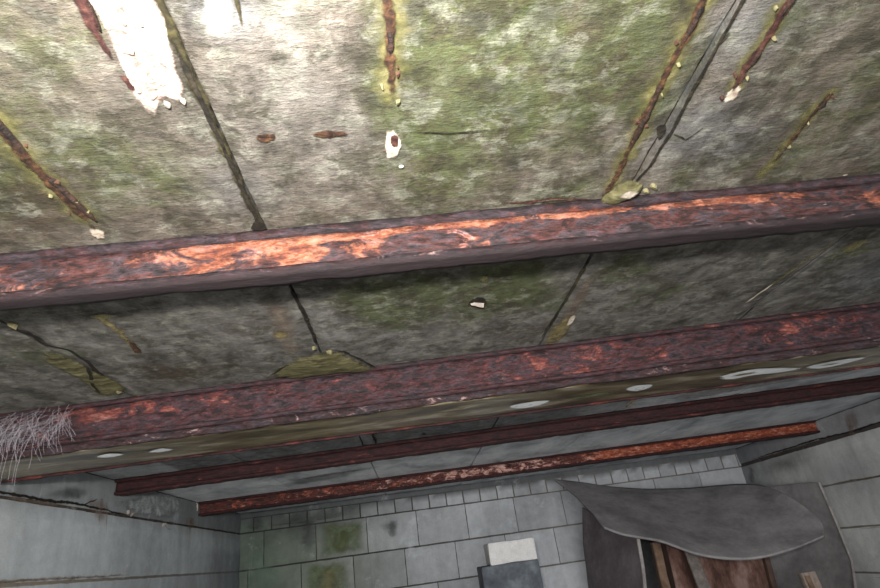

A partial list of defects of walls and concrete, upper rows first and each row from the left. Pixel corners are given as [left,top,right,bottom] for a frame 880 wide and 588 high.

spalling [73,0,186,112]
crack [154,0,266,231]
water stain [206,0,242,29]
crack [635,0,745,182]